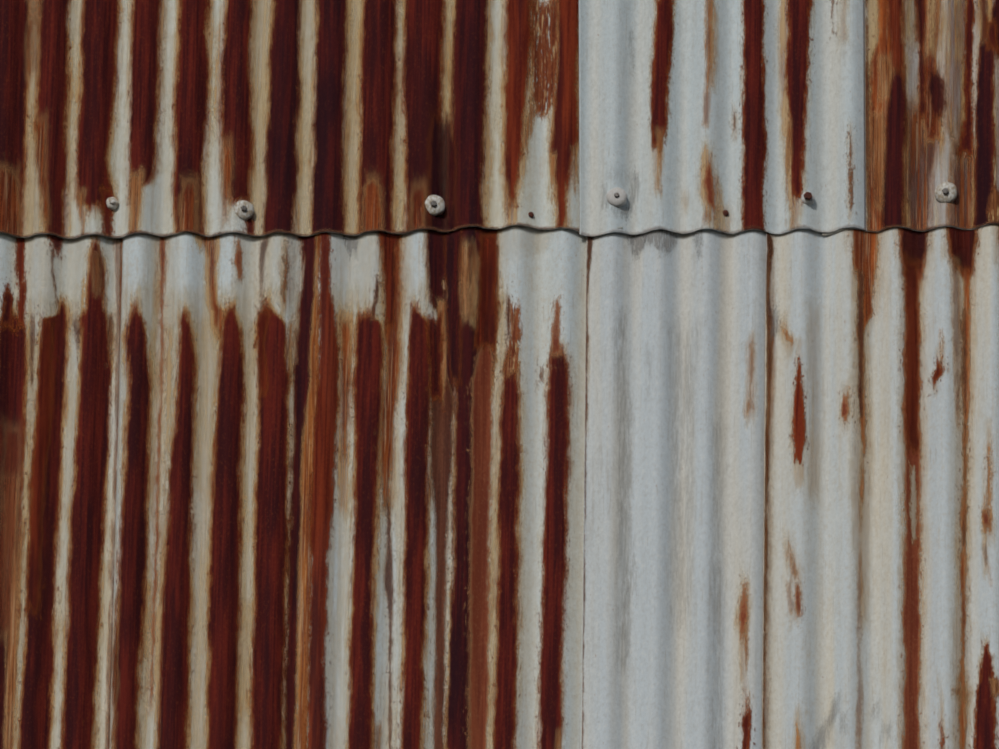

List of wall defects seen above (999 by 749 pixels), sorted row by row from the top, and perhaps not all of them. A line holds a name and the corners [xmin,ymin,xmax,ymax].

corrosion [649,0,675,166]
corrosion [704,0,716,124]
corrosion [784,0,813,205]
corrosion [701,146,725,232]
corrosion [0,0,593,749]
corrosion [733,0,793,749]
corrosion [791,355,807,464]
corrosion [841,0,999,749]
corrosion [787,543,802,616]